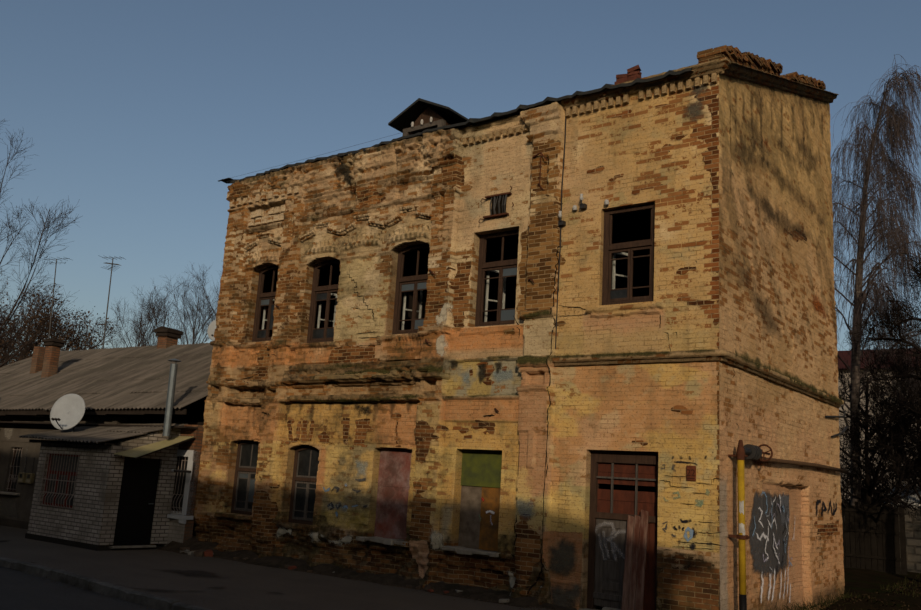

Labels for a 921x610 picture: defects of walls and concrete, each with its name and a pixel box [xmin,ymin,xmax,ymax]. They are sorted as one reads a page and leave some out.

flaking render [437,149,472,192]
crack [334,274,382,349]
flaking render [469,362,507,386]
spalling [414,420,495,463]
spalling [311,533,368,568]
spalling [402,481,541,595]
water stain [549,539,575,576]